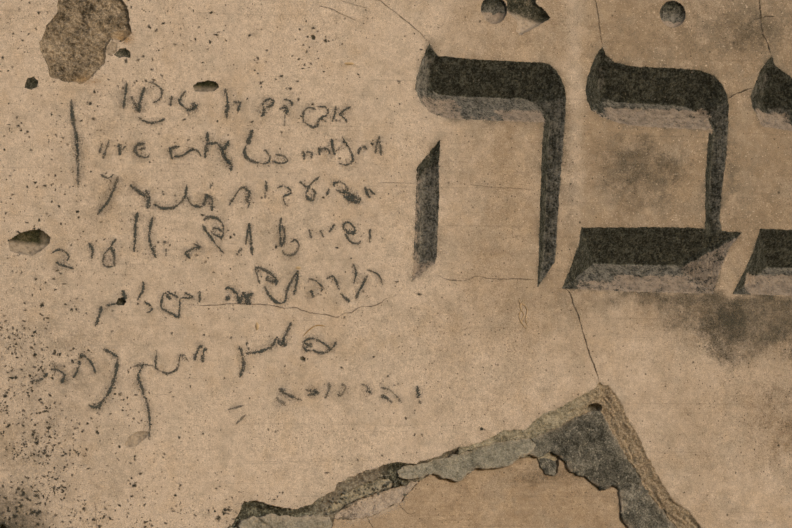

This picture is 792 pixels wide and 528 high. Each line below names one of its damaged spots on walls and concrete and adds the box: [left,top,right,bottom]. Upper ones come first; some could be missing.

spalling [39,0,132,84]
spalling [506,0,550,35]
water stain [643,293,792,362]
peeling [124,431,149,448]
crack [228,288,701,528]